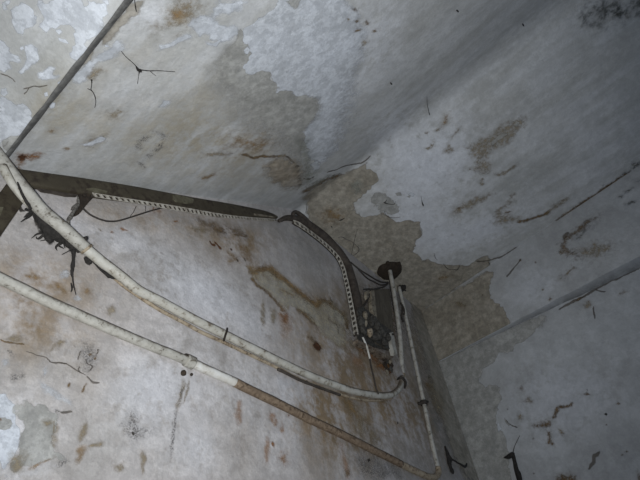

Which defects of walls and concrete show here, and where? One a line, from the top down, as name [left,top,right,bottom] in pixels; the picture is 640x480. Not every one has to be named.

peeling [0,0,143,84]
peeling [0,88,32,151]
peeling [159,0,365,170]
crack [243,153,295,163]
peeling [497,200,567,223]
damp [559,217,596,255]
damp [249,266,349,346]
peeling [303,164,545,480]
crack [1,336,100,384]
peeling [0,394,20,469]